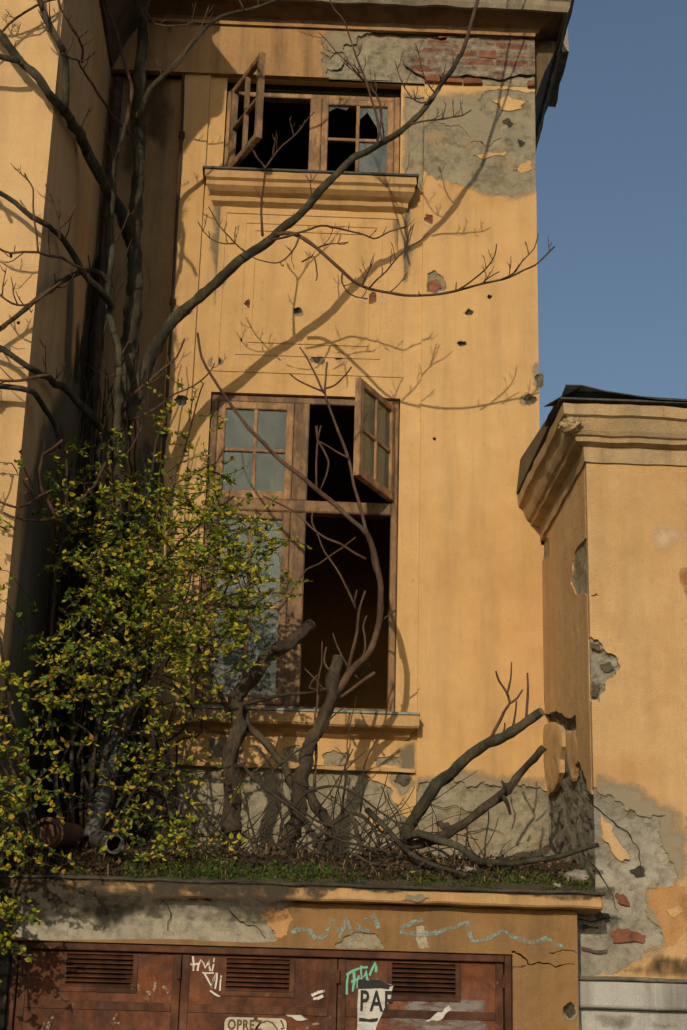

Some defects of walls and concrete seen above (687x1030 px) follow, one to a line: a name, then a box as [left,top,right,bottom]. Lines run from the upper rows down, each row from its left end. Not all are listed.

flaking render [321,32,536,198]
water stain [211,206,222,270]
flaking render [427,271,446,293]
water stain [0,258,615,925]
flaking render [572,540,588,595]
flaking render [590,638,620,702]
flaking render [548,712,576,731]
flaking render [117,738,227,854]
flaking render [238,745,301,854]
flaking render [296,750,687,976]
flaking render [11,896,293,943]
crack [512,950,574,968]